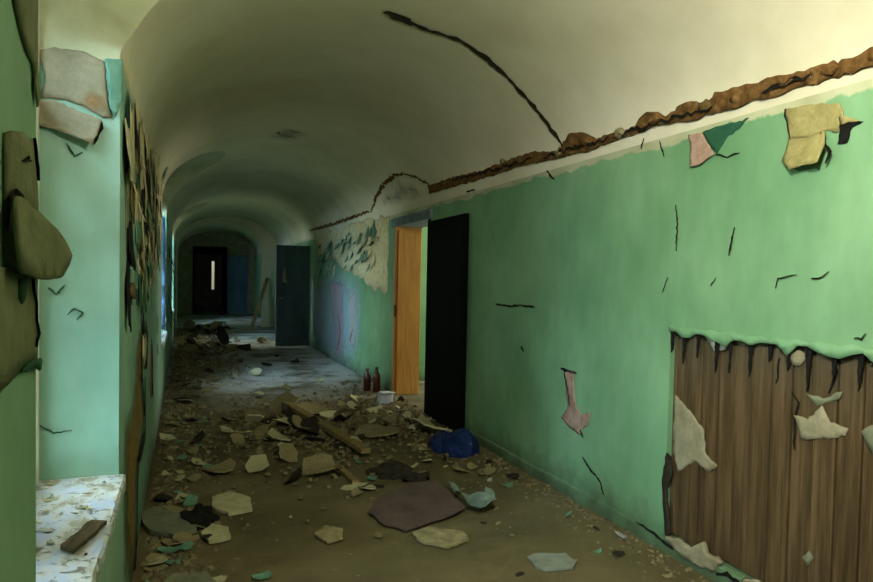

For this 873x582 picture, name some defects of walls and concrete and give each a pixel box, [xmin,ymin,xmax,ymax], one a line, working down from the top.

crack [383,11,562,146]
spalling [428,47,873,194]
peeling [0,131,73,393]
peeling [12,0,176,398]
spalling [186,320,267,351]
crack [672,205,680,251]
crack [775,271,829,288]
spalling [636,522,762,582]